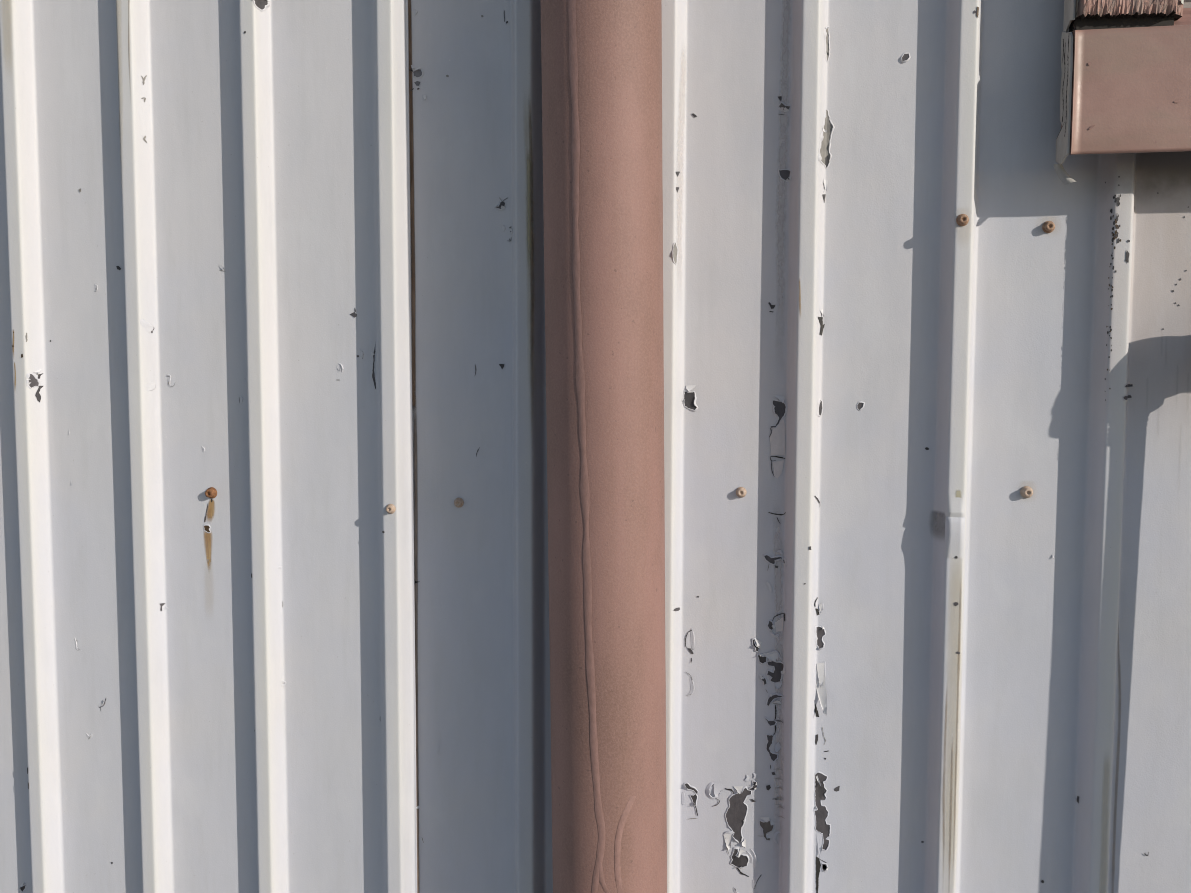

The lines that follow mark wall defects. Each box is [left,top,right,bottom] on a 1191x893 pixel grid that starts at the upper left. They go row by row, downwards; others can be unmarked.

peeling [253,0,270,12]
peeling [818,109,835,203]
peeling [25,369,43,402]
peeling [682,385,698,412]
peeling [769,395,788,479]
corrosion [203,499,214,566]
peeling [751,613,786,706]
peeling [814,597,827,717]
peeling [723,769,785,877]
peeling [813,771,840,872]